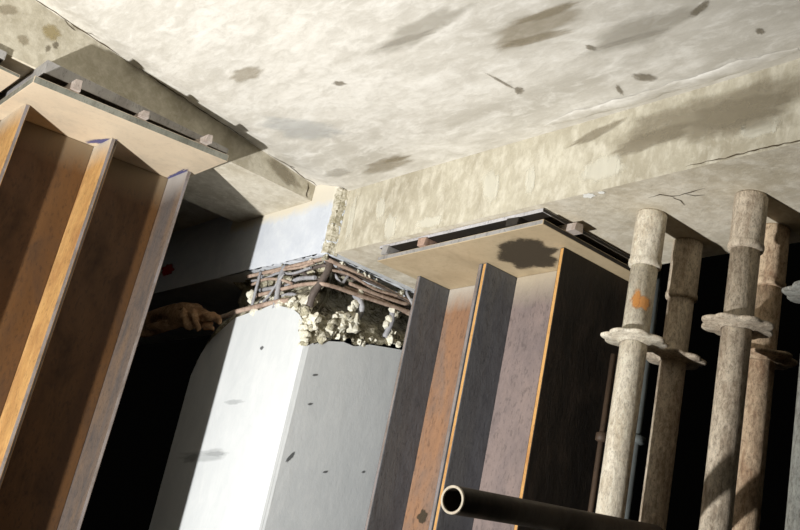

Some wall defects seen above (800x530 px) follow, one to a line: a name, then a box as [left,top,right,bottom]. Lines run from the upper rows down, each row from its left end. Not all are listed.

damp [44,26,59,39]
crack [688,140,800,166]
crack [649,188,705,203]
spalling [205,188,412,348]
corrosion [632,291,649,310]